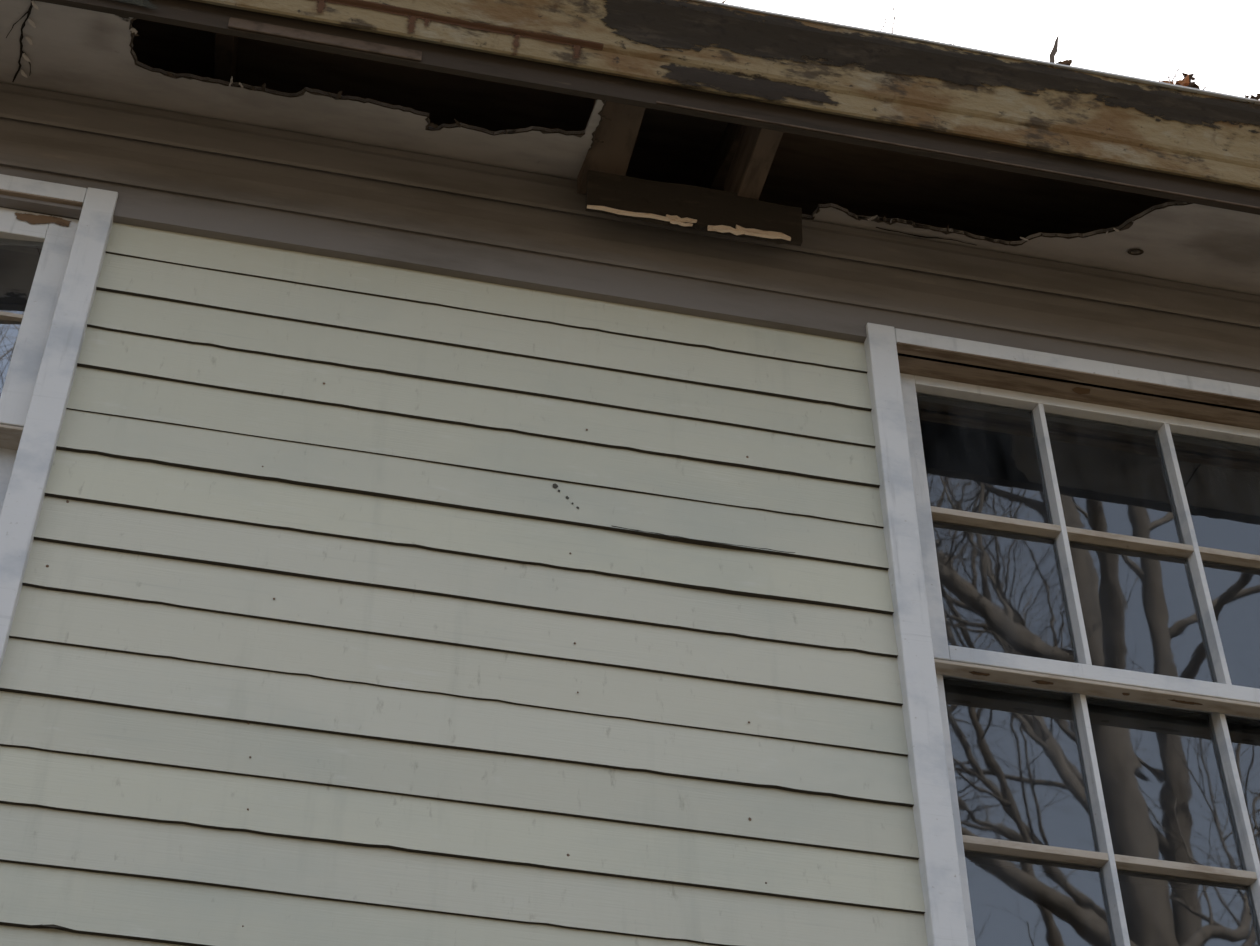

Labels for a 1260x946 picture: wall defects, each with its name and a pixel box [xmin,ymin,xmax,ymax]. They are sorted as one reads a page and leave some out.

crack [6,0,39,82]